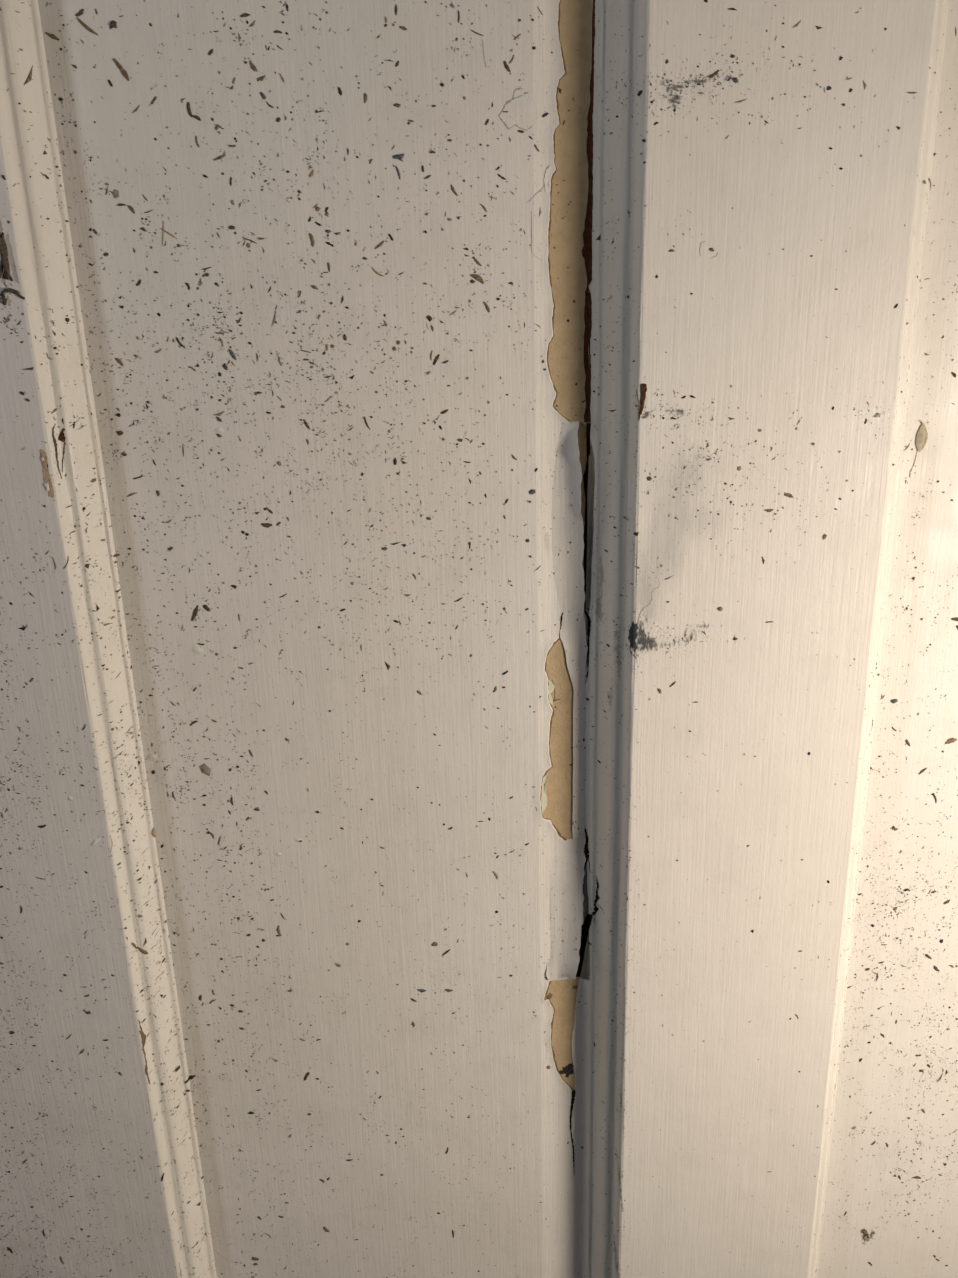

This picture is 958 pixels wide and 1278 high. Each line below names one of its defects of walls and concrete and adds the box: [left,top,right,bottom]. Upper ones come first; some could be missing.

peeling [499,0,601,521]
peeling [531,631,586,1094]
crack [552,421,599,977]
crack [568,1090,576,1173]